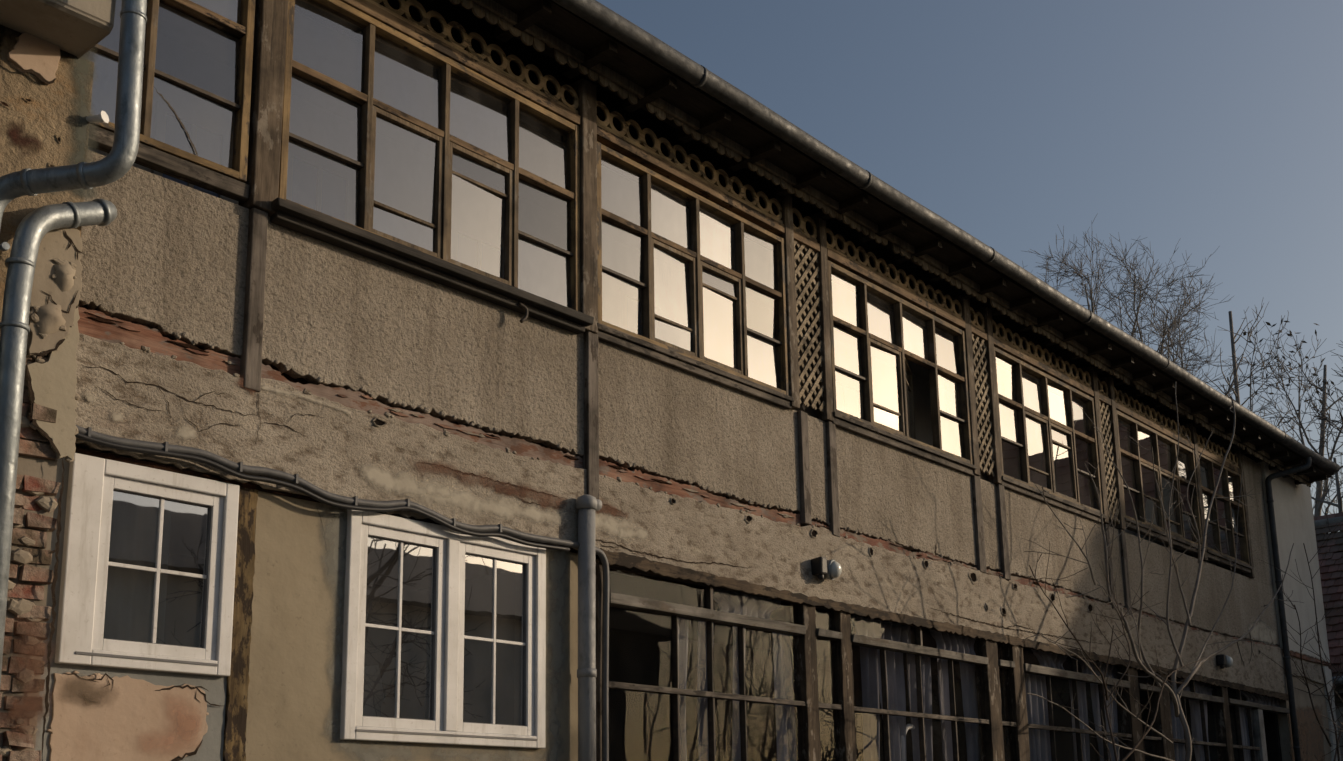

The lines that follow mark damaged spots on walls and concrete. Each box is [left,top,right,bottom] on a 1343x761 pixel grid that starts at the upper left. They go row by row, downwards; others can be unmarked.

flaking render [7,33,60,86]
flaking render [18,228,241,463]
crack [81,364,325,443]
flaking render [261,360,583,469]
crack [417,462,567,508]
crack [595,504,749,568]
flaking render [599,459,1110,613]
flaking render [0,474,209,761]
flaking render [1132,609,1331,666]